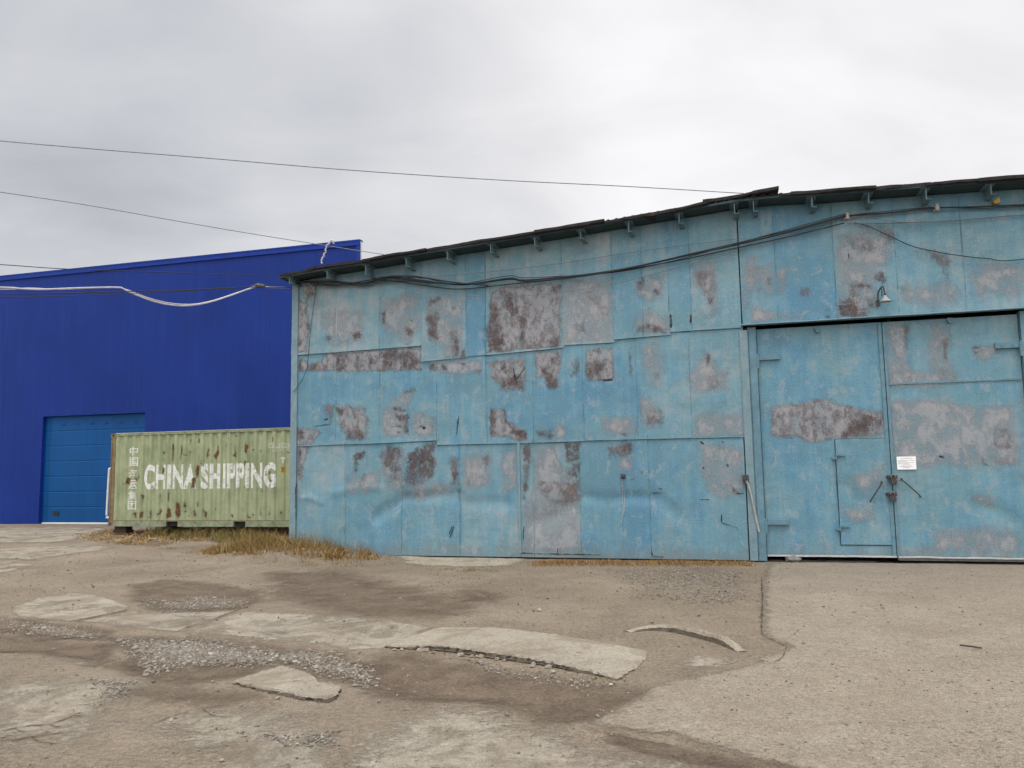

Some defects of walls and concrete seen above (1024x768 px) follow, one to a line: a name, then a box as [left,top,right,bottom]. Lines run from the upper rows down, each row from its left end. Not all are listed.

peeling [838,230,891,315]
peeling [298,283,562,390]
peeling [586,347,614,381]
peeling [636,278,667,378]
peeling [888,325,954,388]
peeling [336,405,368,439]
peeling [771,398,1018,466]
peeling [523,448,580,552]
crack [721,580,787,672]